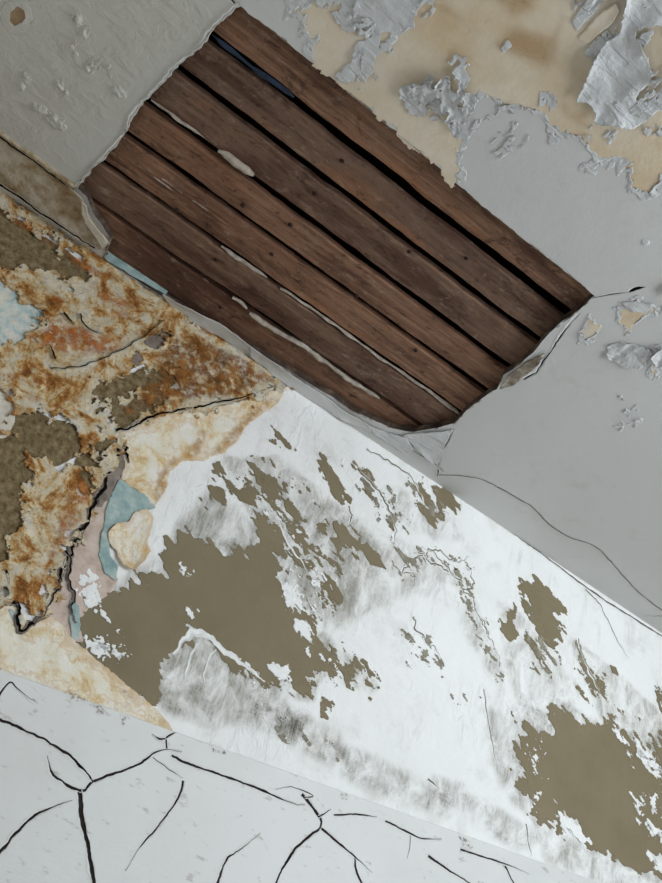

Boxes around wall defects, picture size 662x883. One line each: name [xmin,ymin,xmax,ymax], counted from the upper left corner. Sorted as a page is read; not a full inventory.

peeling [284,0,662,201]
corrosion [32,315,117,353]
corrosion [143,323,269,406]
peeling [0,0,545,731]
peeling [606,295,662,381]
crack [0,384,278,635]
crack [346,506,354,526]
crack [356,428,662,673]
crack [576,639,607,706]
crack [0,680,533,883]